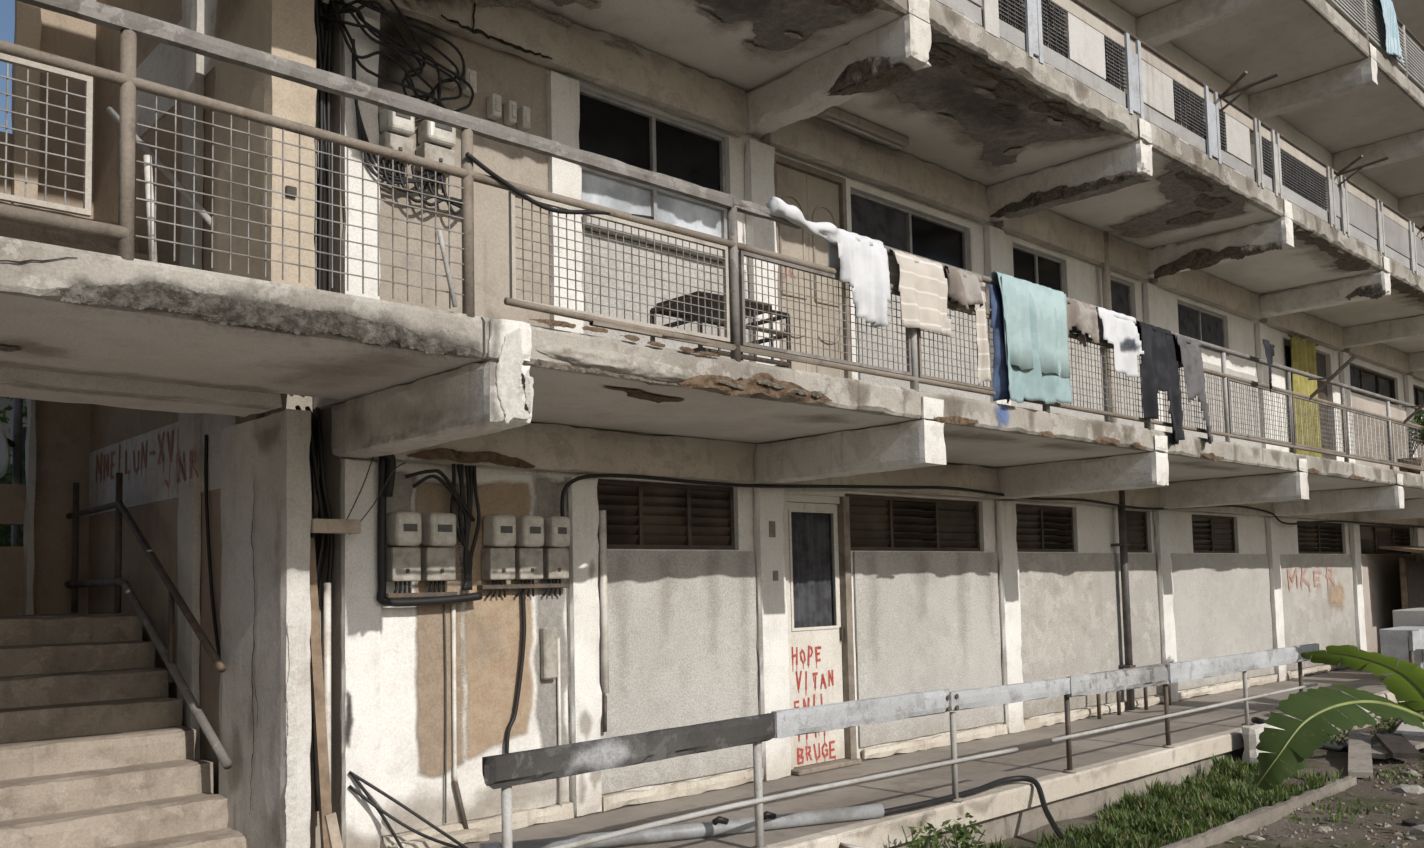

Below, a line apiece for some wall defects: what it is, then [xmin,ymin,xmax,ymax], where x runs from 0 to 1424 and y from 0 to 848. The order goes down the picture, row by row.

spalling [472,0,601,27]
spalling [695,0,880,52]
spalling [824,34,1117,166]
spalling [990,161,1246,237]
crack [0,256,77,264]
spalling [1153,224,1424,303]
spalling [60,281,475,357]
peeling [492,326,534,423]
spalling [603,373,832,403]
flaking render [386,472,415,516]
flaking render [535,477,567,518]
flaking render [535,579,570,748]